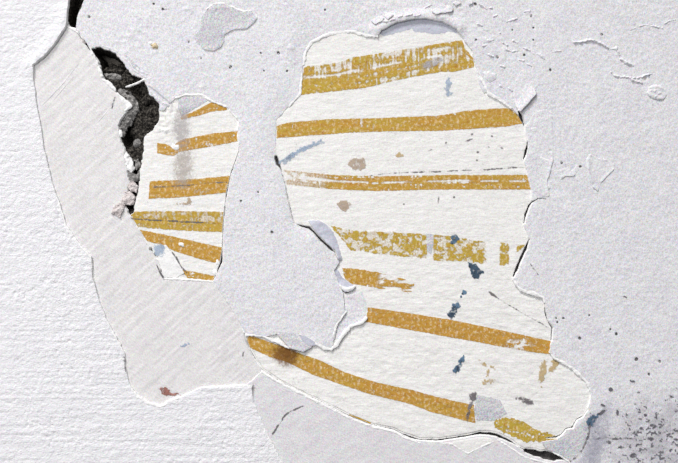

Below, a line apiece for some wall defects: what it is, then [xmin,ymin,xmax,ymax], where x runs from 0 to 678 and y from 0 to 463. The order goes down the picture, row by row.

peeling [34,13,591,462]